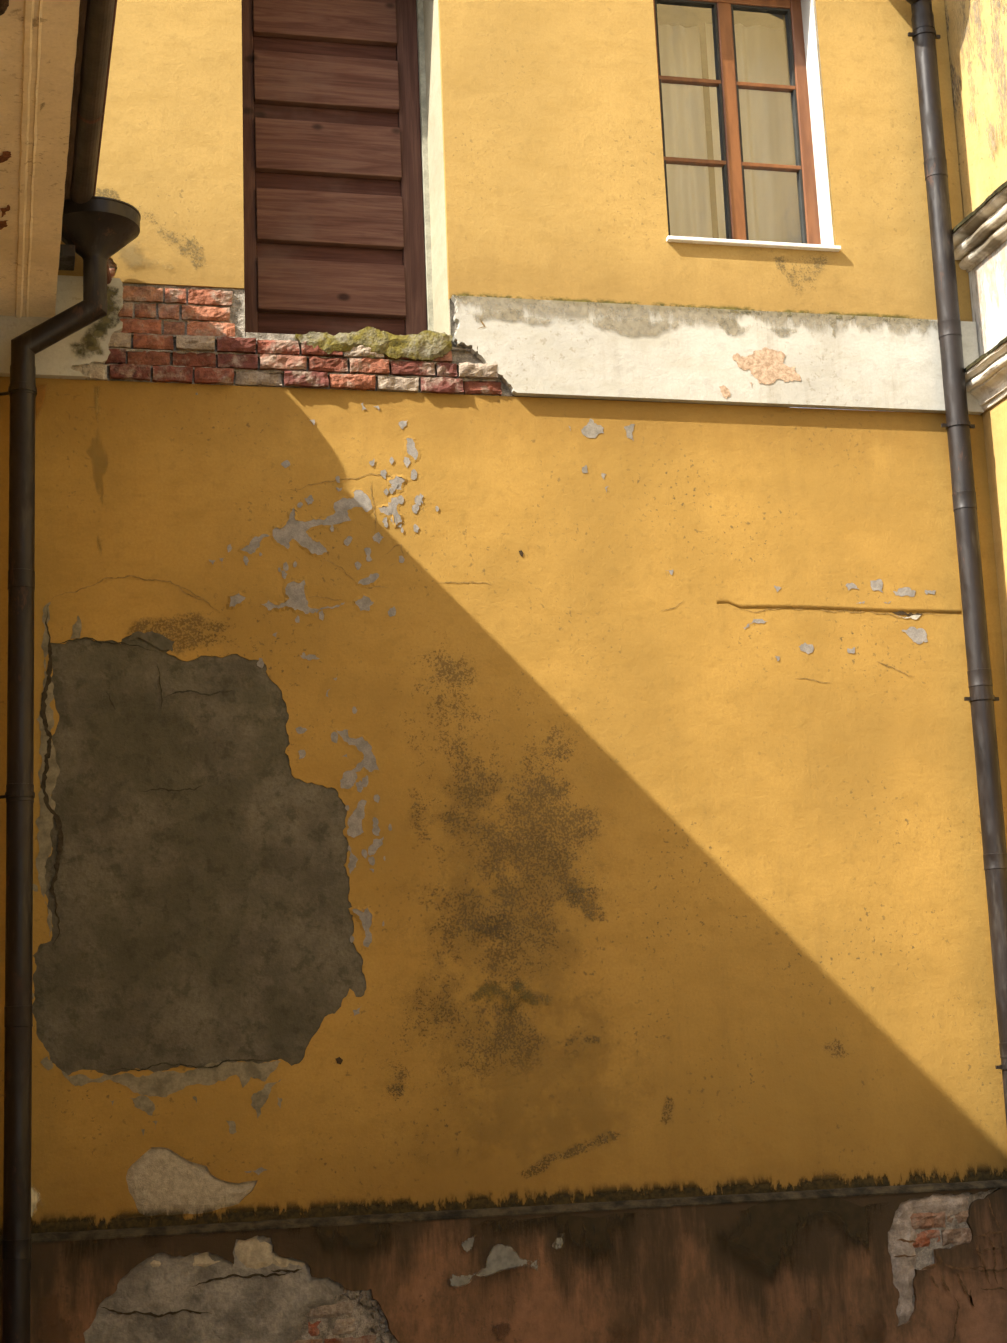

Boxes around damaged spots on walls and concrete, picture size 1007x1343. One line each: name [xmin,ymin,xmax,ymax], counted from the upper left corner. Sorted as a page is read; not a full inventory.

water stain [971,241,1007,340]
peeling [732,347,804,388]
peeling [209,421,439,623]
crack [726,604,956,620]
peeling [331,706,392,873]
peeling [251,1080,282,1119]
flaking render [126,1095,267,1215]
peeling [193,1252,220,1267]
peeling [235,1236,305,1269]
peeling [450,1244,538,1286]
water stain [31,1167,1007,1278]
spalling [888,1188,998,1326]